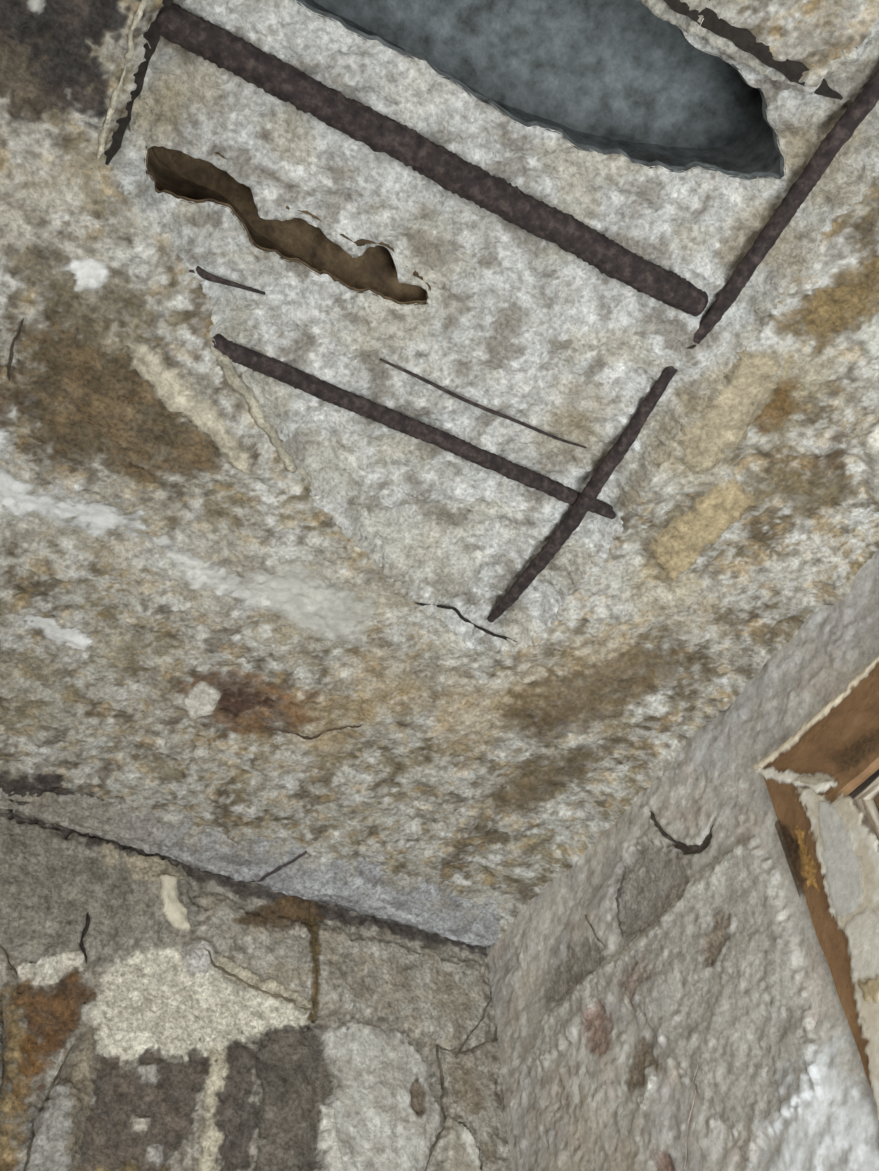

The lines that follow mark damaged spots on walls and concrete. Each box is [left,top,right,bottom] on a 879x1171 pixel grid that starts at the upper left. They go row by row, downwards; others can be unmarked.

peeling [29,0,43,11]
leakage [0,0,145,120]
spalling [97,0,879,654]
corrosion [778,257,879,353]
corrosion [753,379,799,433]
corrosion [742,435,850,508]
crack [80,913,90,964]
crack [204,900,318,1017]
crack [0,945,18,1095]
crack [23,1043,75,1171]
crack [424,999,498,1171]